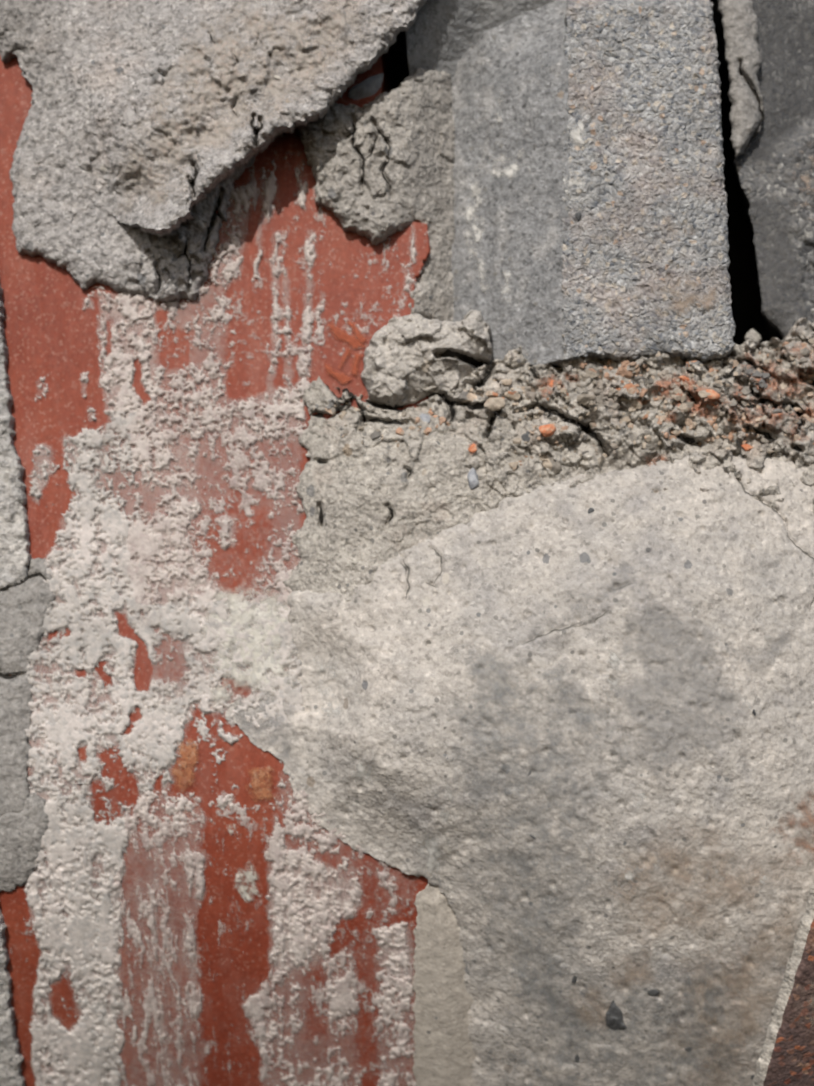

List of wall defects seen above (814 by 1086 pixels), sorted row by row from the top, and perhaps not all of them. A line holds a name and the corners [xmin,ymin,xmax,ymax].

crack [232,101,263,145]
crack [346,117,391,196]
crack [739,61,765,152]
crack [156,165,222,293]
spalling [539,424,556,437]
spalling [705,389,720,400]
peeling [24,408,305,1086]
peeling [230,772,418,1086]